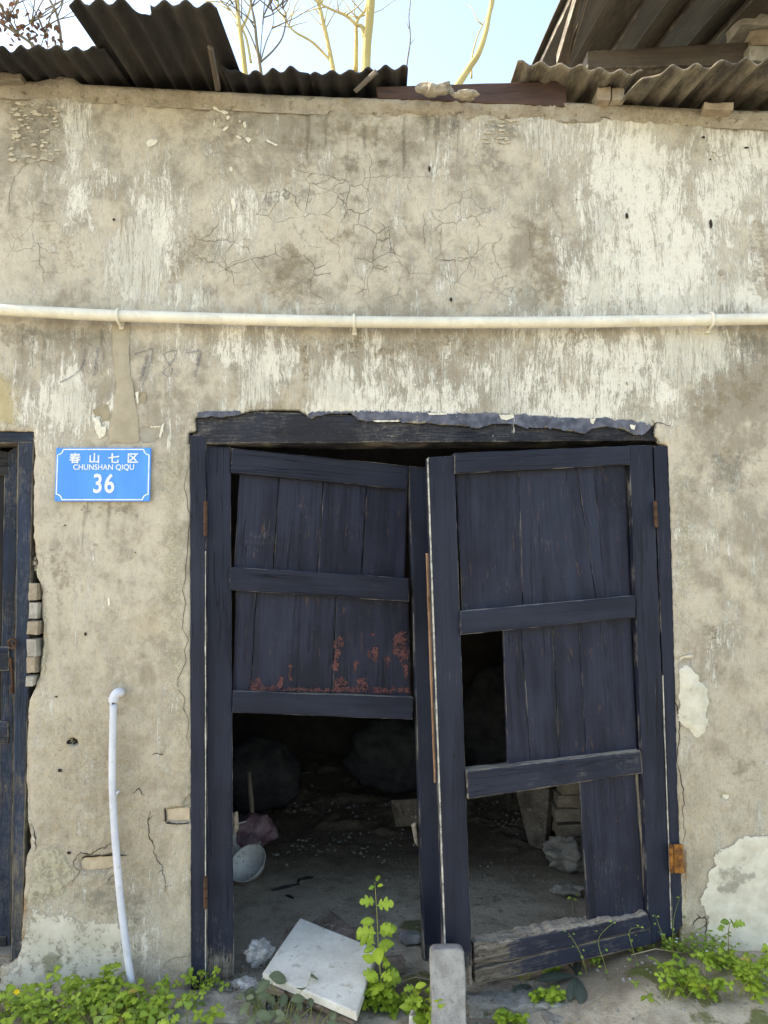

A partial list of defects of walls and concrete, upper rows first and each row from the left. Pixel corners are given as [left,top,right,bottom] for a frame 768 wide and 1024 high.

crack [293,153,521,303]
peeling [196,410,241,418]
peeling [308,409,651,435]
spalling [26,561,48,686]
crack [134,788,172,891]
flaking render [700,836,768,952]